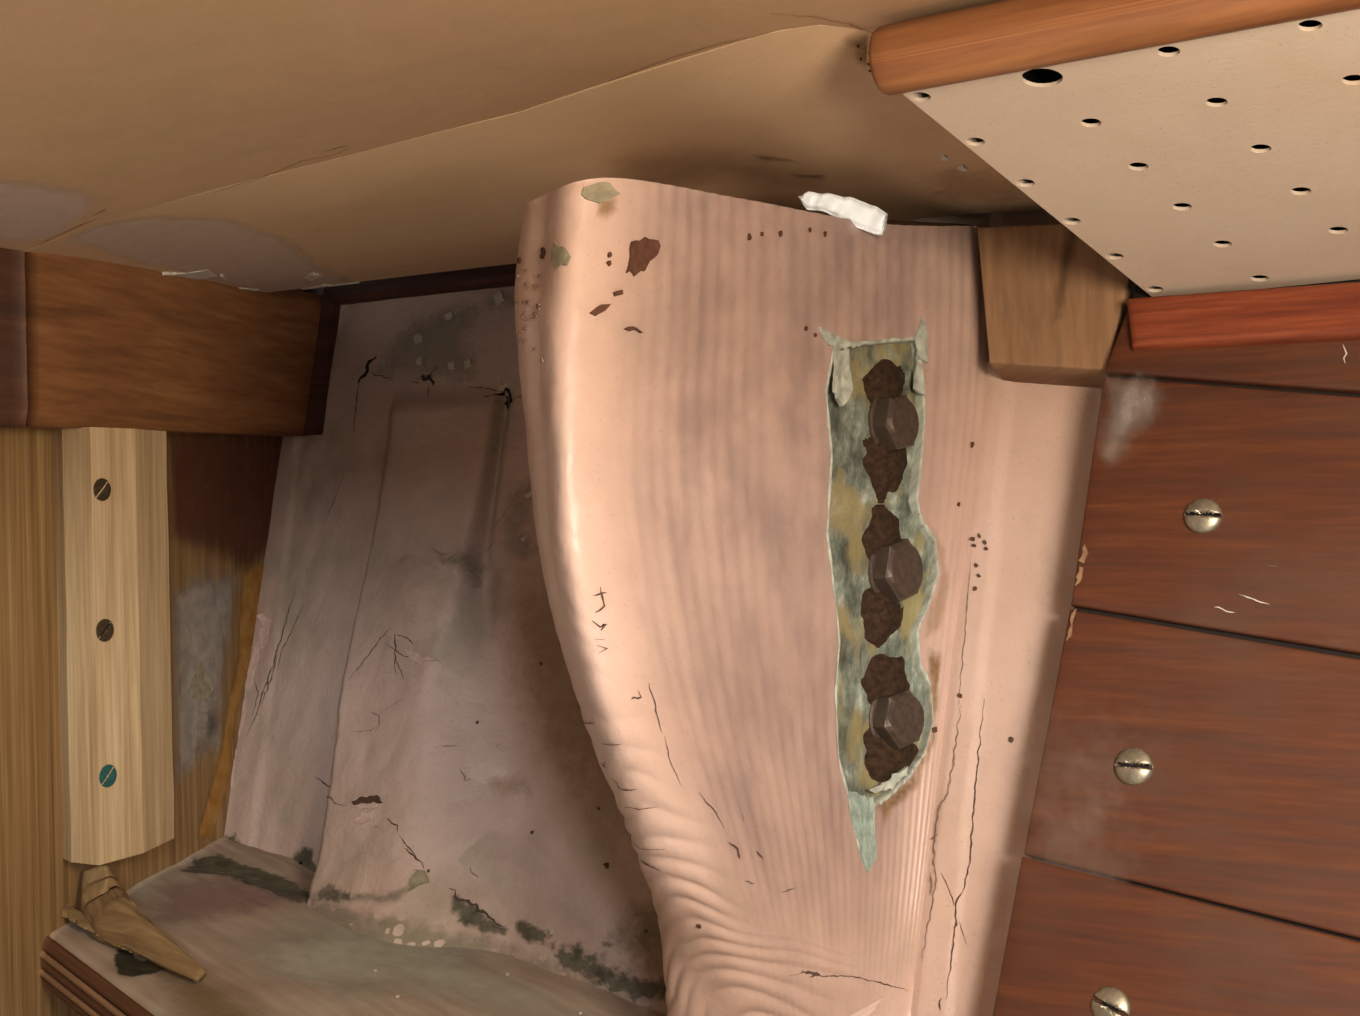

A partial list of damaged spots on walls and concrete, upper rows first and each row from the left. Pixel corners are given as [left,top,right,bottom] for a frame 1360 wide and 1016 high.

peeling [162,269,259,291]
rust [862,359,905,404]
rust [861,437,908,560]
peeling [819,316,940,831]
crack [248,590,302,732]
rust [860,587,910,705]
rust [863,728,919,813]
crack [922,563,984,1010]
damp [293,848,316,872]
damp [171,854,551,991]
damp [555,944,666,1000]
crack [790,971,909,991]